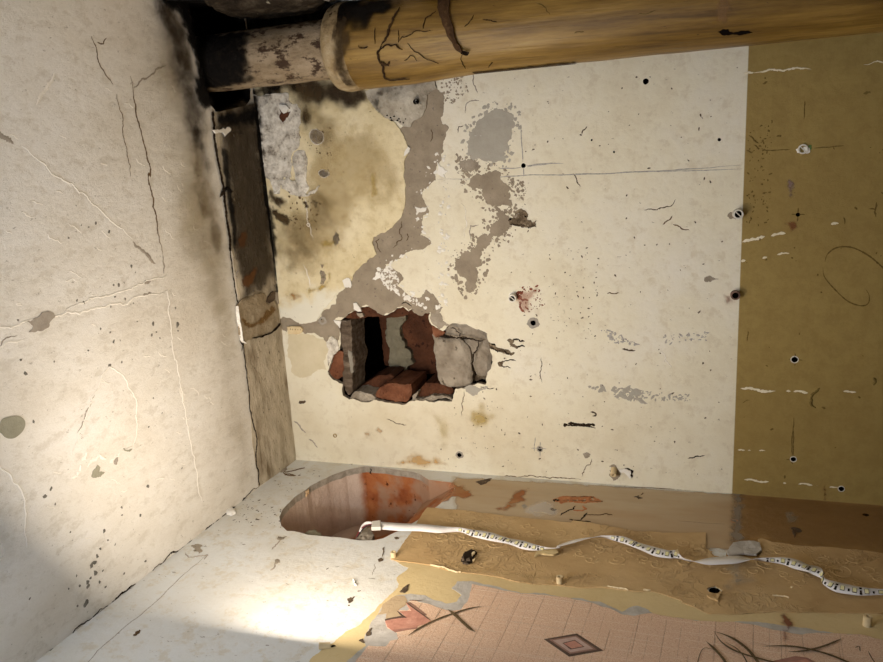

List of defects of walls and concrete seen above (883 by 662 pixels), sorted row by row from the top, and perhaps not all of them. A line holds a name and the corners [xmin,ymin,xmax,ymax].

crack [211,111,239,303]
water stain [288,195,326,230]
peeling [236,76,540,378]
crack [88,341,260,662]
crack [73,584,135,633]